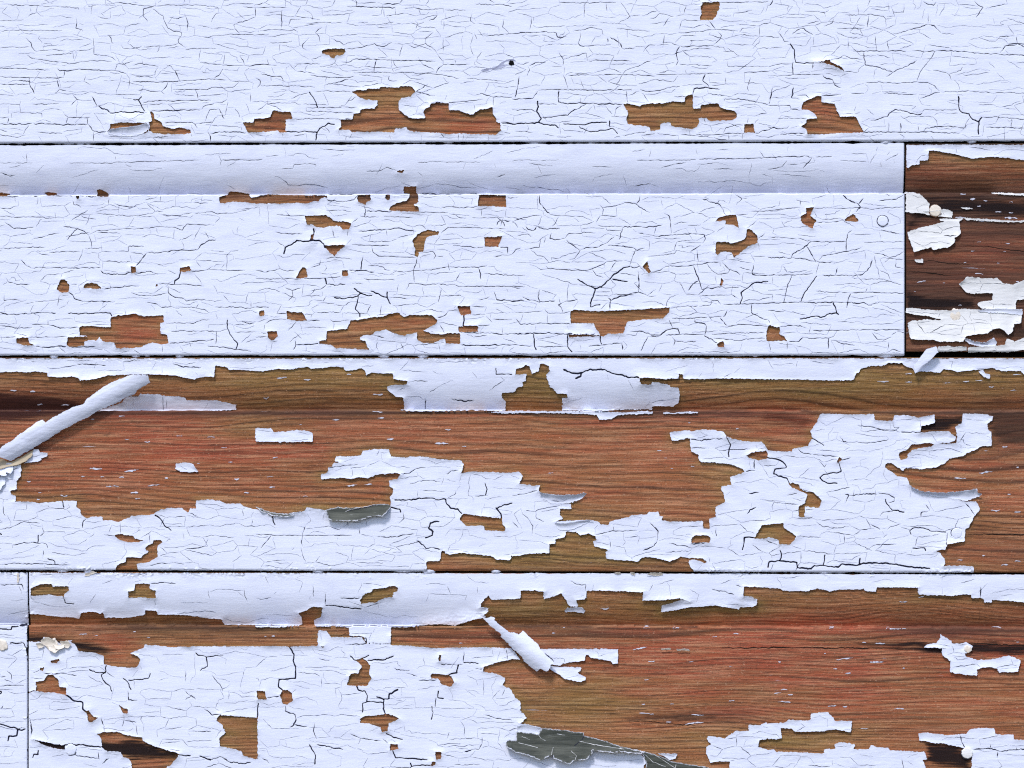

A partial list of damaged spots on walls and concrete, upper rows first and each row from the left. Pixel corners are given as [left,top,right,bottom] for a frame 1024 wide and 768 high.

peeling [243,110,292,133]
peeling [339,86,501,135]
peeling [623,95,755,133]
peeling [801,96,864,135]
crack [0,0,1024,410]
peeling [0,143,1024,695]
crack [595,416,1024,606]
crack [0,452,565,768]
peeling [385,586,1024,768]
peeling [216,714,258,759]
peeling [360,713,399,732]
crack [717,717,874,768]